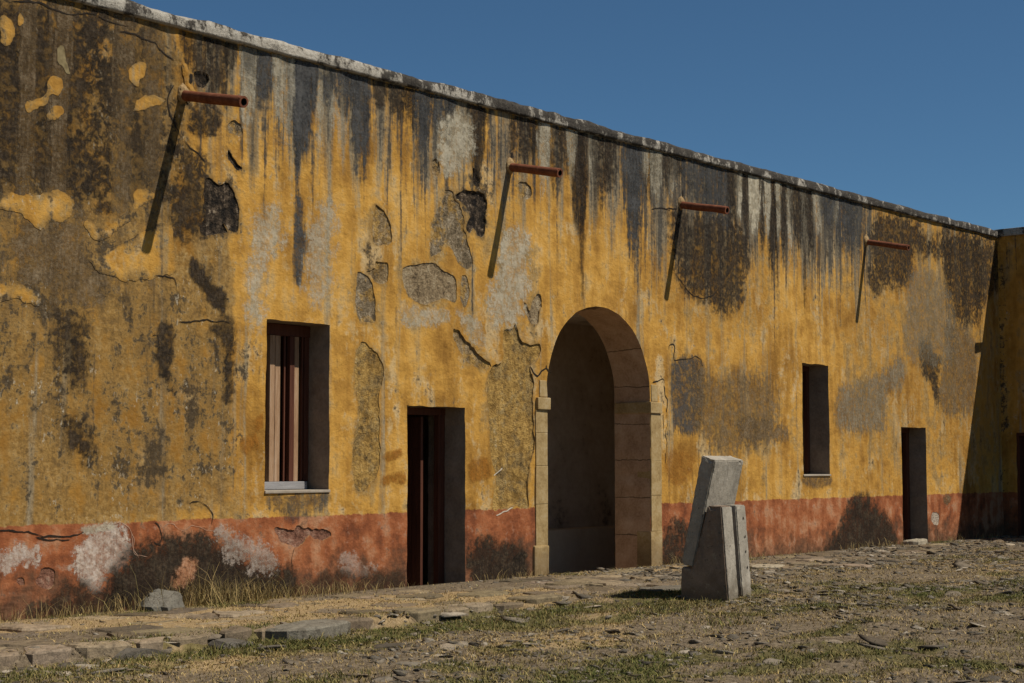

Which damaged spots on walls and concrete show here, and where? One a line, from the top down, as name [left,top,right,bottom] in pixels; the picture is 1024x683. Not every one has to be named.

flaking render [200,178,240,236]
water stain [163,30,487,403]
flaking render [355,261,389,323]
flaking render [402,168,487,308]
water stain [510,116,998,433]
water stain [155,322,176,393]
flaking render [352,342,384,492]
flaking render [453,324,541,511]
water stain [671,355,788,455]
crack [0,529,83,541]
water stain [26,522,297,619]
flaking render [274,525,331,547]